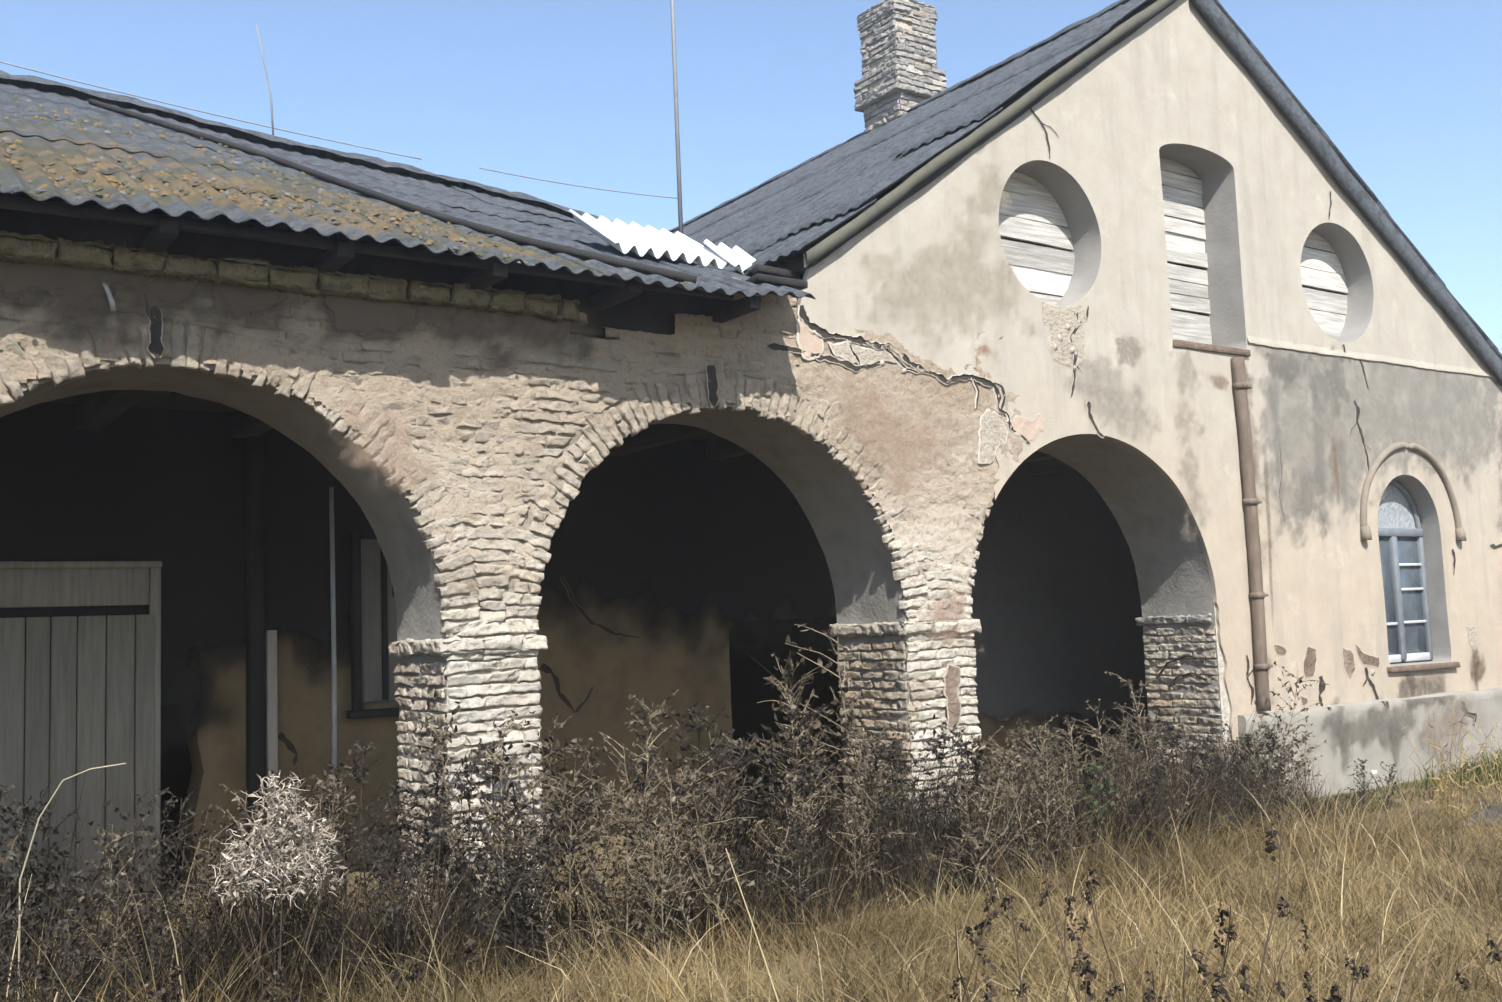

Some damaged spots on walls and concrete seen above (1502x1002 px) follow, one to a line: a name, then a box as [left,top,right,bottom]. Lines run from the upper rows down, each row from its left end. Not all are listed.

crack [1029,108,1059,158]
spalling [796,318,907,374]
crack [768,305,1030,445]
spalling [1040,300,1088,369]
crack [1342,344,1371,472]
leakage [1256,346,1502,541]
crack [539,663,594,713]
crack [1156,654,1207,687]
crack [1245,655,1276,756]
spalling [1273,643,1317,707]
spalling [1341,643,1380,680]